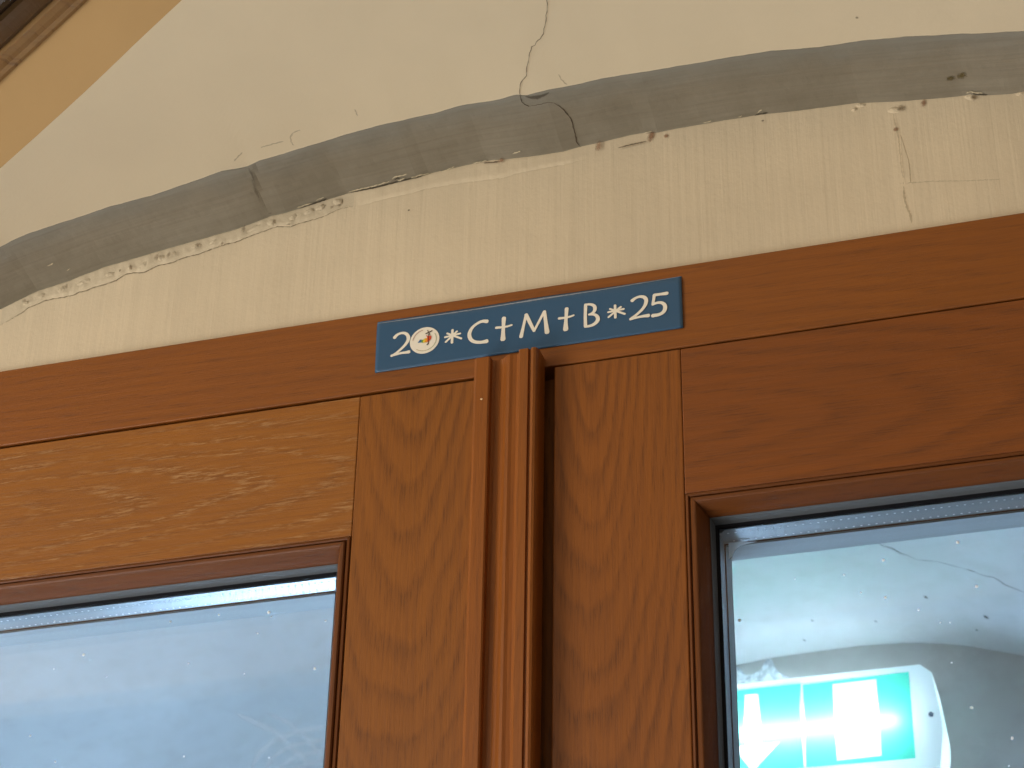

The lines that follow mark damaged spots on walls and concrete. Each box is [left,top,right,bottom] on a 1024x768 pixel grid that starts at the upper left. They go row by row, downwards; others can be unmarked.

crack [519,0,579,145]
peeling [0,167,453,325]